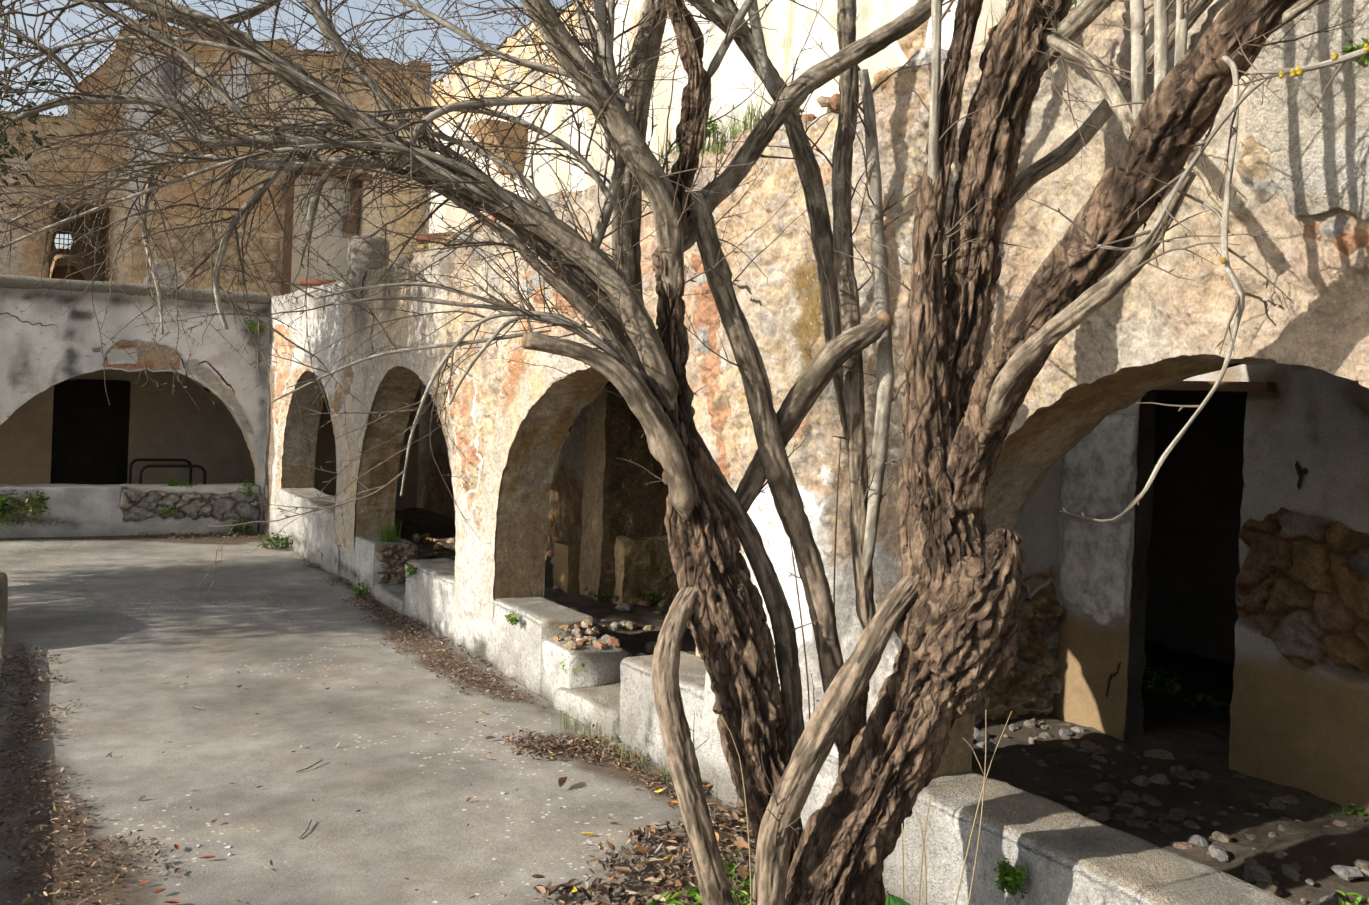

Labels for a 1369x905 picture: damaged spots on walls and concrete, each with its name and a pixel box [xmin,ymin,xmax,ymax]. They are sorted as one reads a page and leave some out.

spalling [1302,215,1369,277]
crack [0,312,58,328]
spalling [90,338,255,437]